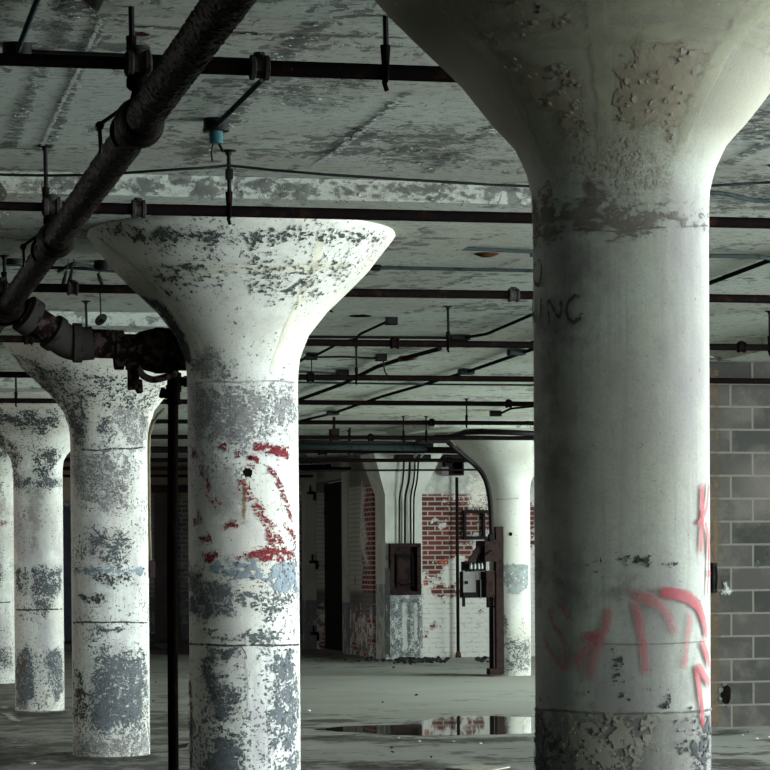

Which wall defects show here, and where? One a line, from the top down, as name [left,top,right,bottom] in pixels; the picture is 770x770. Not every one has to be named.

peeling [610,36,715,145]
peeling [94,220,387,458]
peeling [0,348,159,606]
spalling [232,466,255,524]
peeling [14,564,63,618]
peeling [384,565,428,659]
peeling [188,555,301,770]
peeling [533,692,662,770]
peeling [674,704,713,770]
spalling [718,682,731,707]